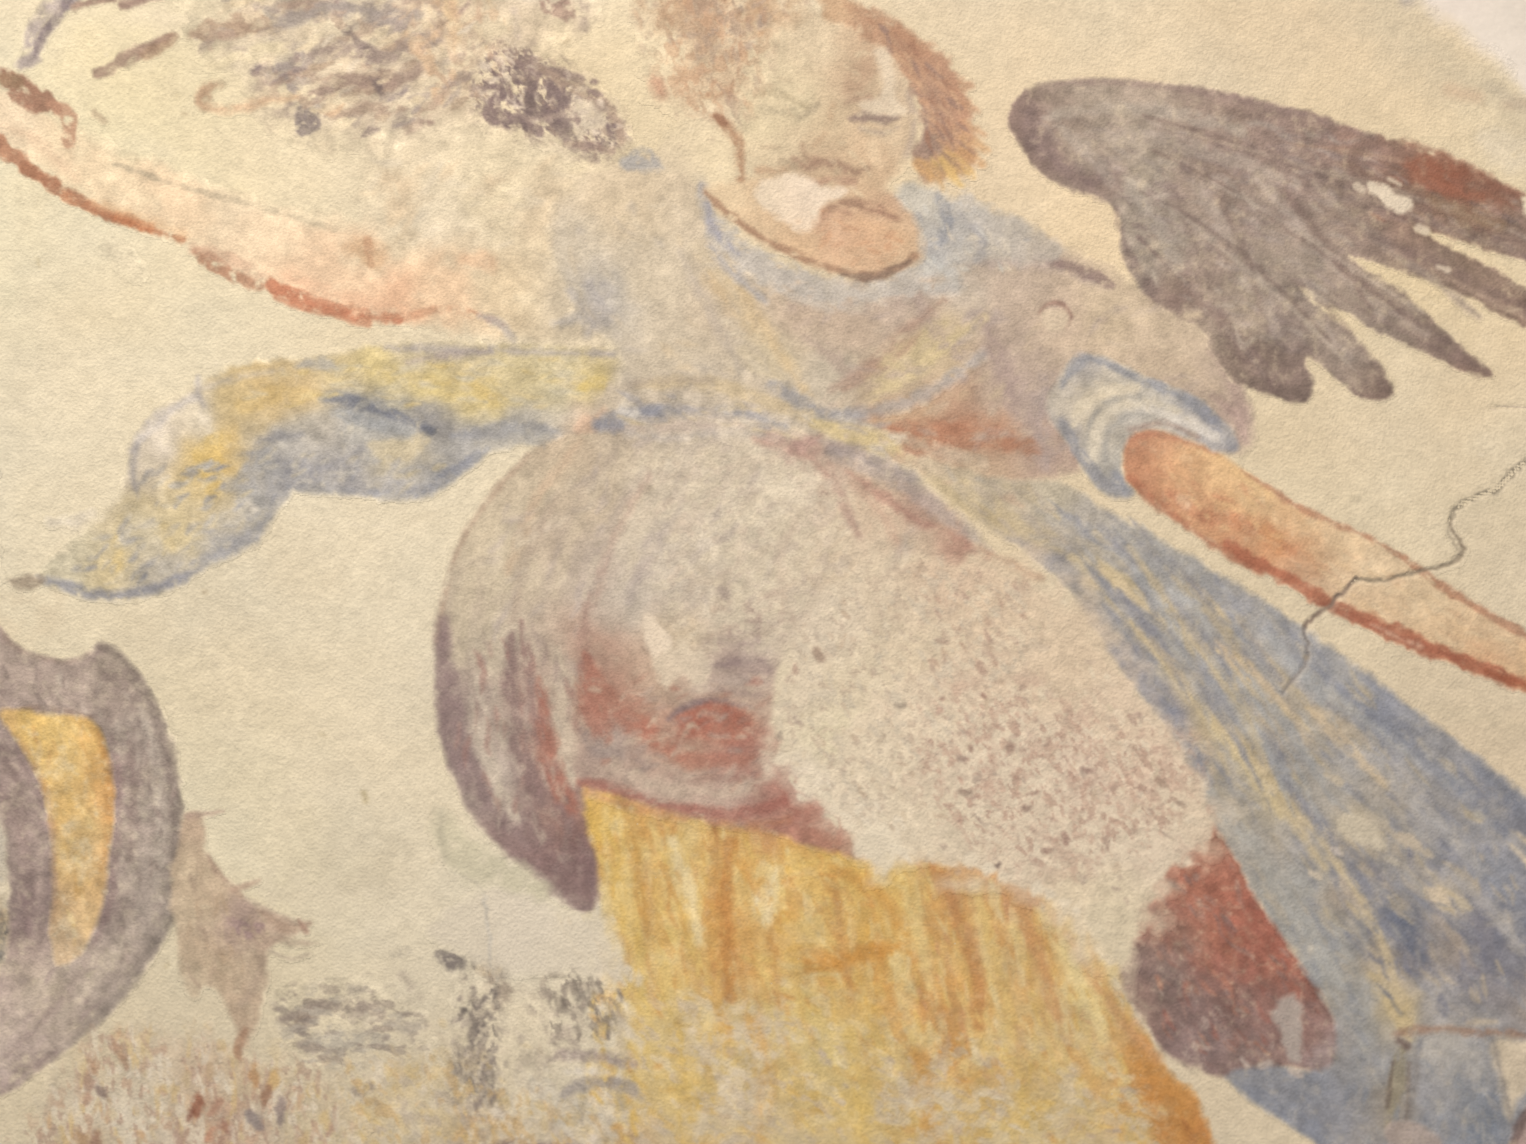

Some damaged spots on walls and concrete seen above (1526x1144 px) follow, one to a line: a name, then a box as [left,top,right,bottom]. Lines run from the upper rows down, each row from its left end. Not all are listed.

crack [1280,456,1526,698]